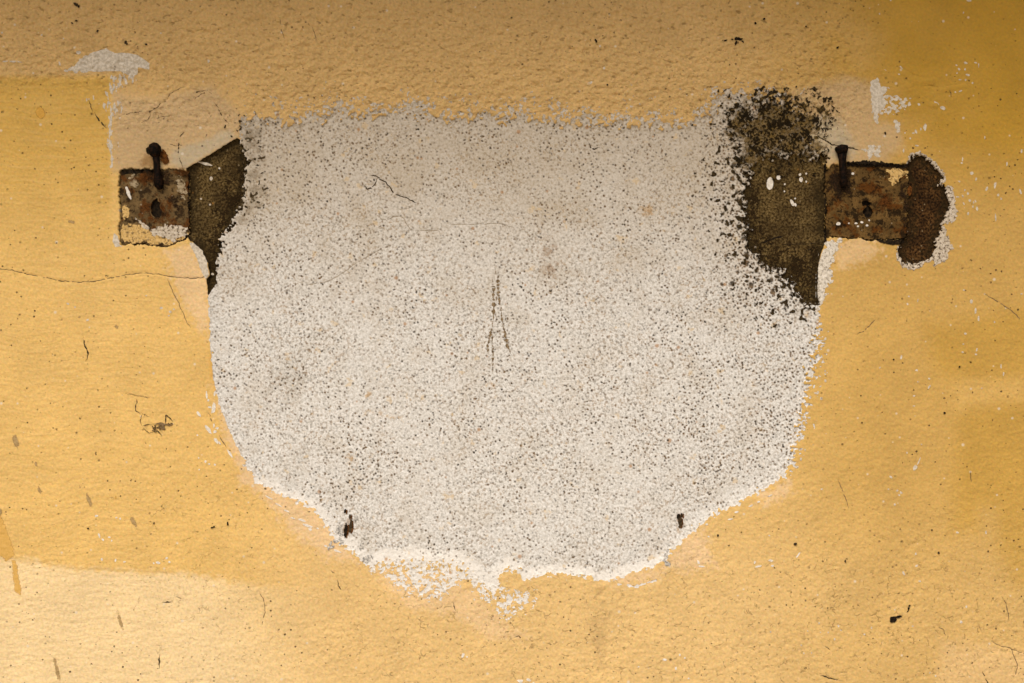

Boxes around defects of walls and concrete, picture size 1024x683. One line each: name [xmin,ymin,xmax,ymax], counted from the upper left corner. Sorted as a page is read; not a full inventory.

rust [146,147,187,176]
rust [828,167,855,201]
crack [0,268,204,328]
peeling [186,80,843,620]